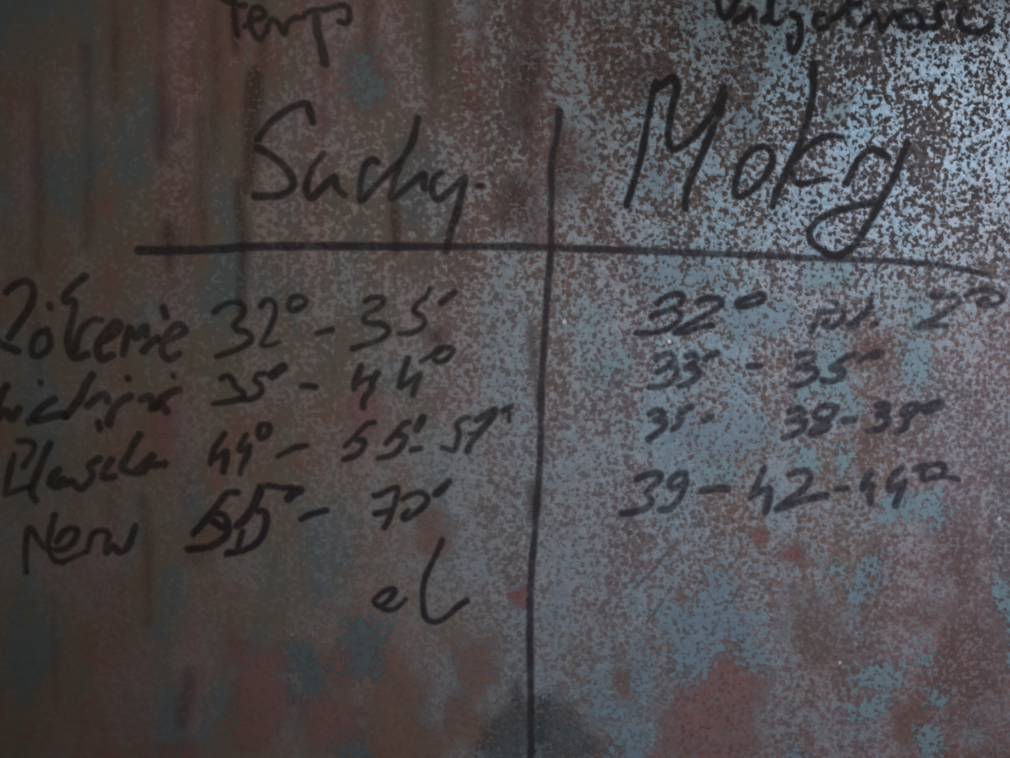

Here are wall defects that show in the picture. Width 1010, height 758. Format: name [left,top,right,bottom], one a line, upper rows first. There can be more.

corrosion [933,624,994,727]